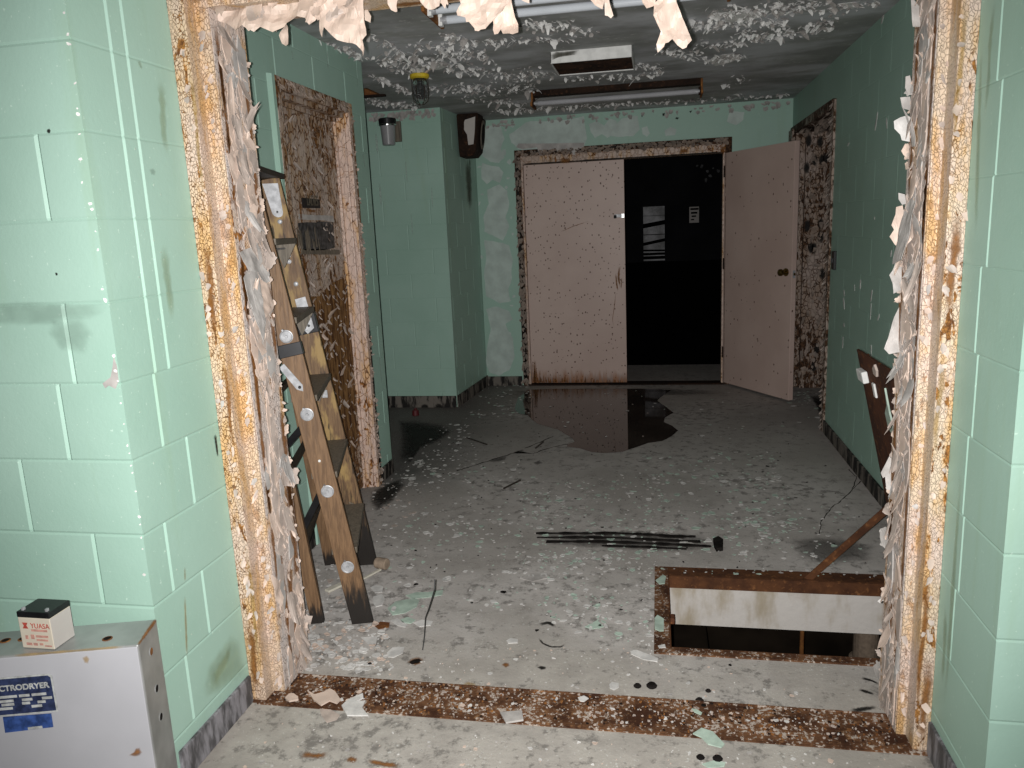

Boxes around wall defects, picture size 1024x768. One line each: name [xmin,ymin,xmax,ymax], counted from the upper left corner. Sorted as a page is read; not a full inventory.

peeling [198,0,884,724]
spalling [630,0,962,737]
crack [819,469,861,534]
peeling [949,176,968,221]